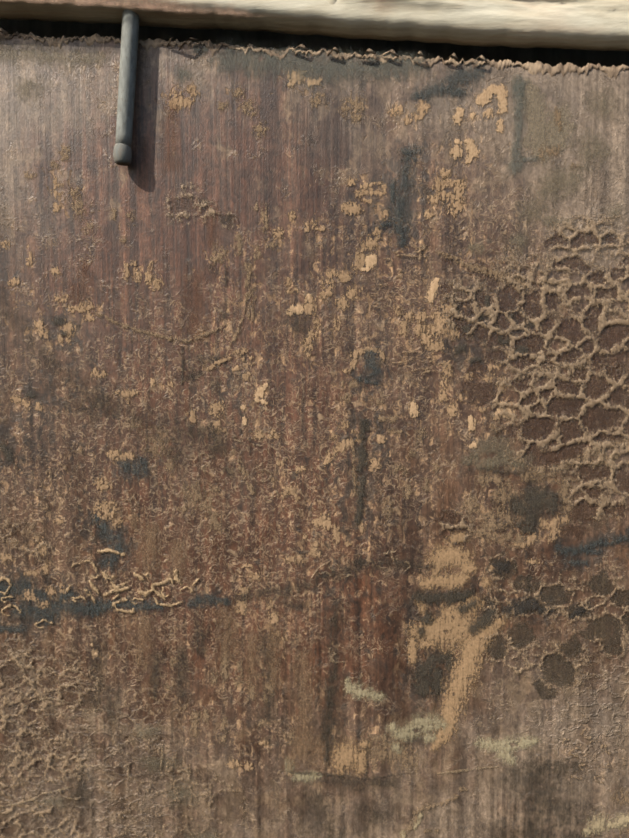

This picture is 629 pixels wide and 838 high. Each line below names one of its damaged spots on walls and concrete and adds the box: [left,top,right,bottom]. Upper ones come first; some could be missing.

peeling [287,69,325,108]
peeling [387,100,431,126]
damp [411,63,486,101]
peeling [452,83,508,133]
peeling [450,138,481,164]
peeling [340,177,387,217]
peeling [424,167,467,220]
peeling [284,209,390,359]
peeling [419,470,578,592]
damp [0,575,164,666]
peeling [404,594,484,664]